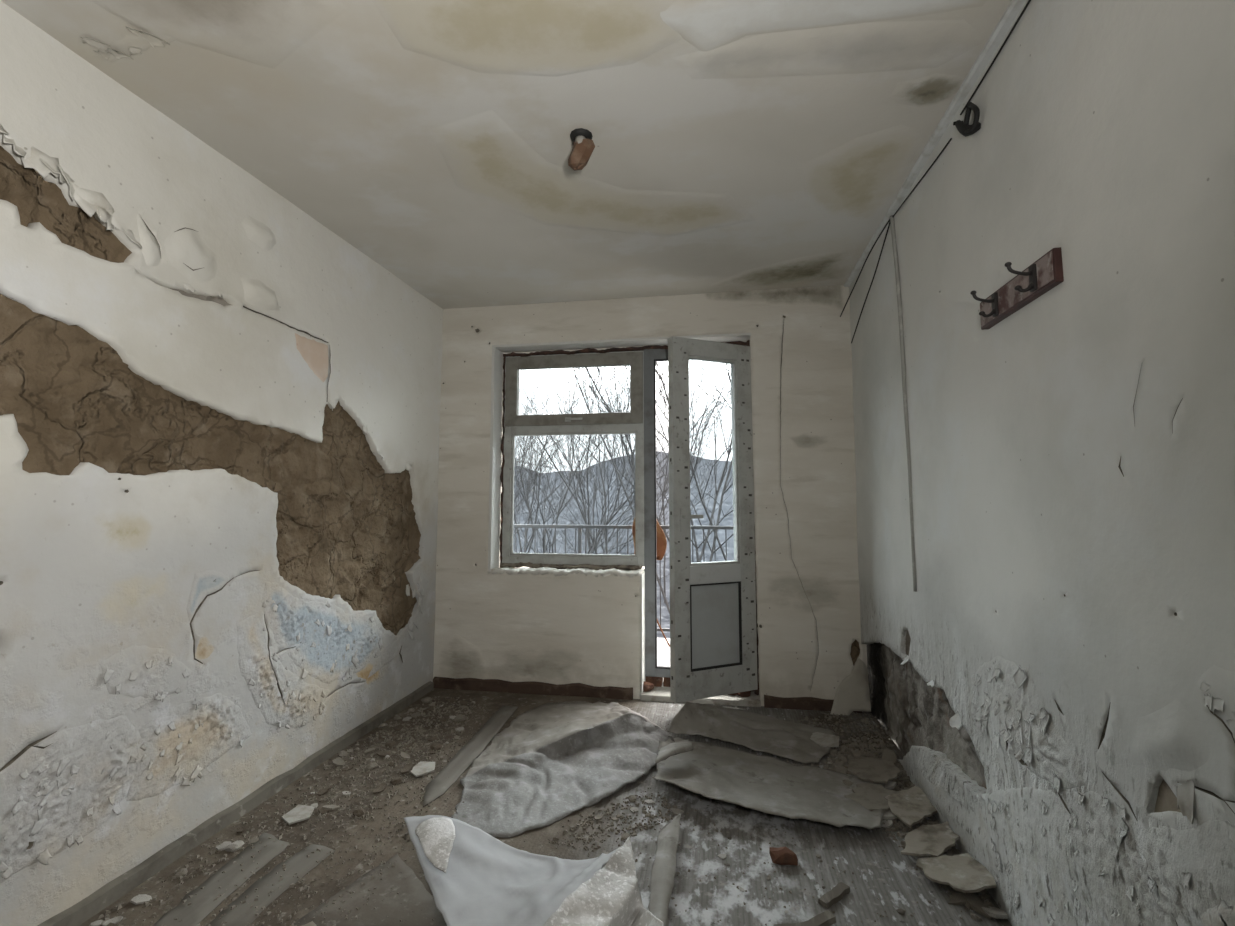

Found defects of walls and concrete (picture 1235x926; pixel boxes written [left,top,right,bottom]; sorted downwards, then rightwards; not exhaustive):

leakage [90,0,349,69]
spalling [0,124,142,263]
leakage [429,110,756,237]
leakage [802,124,925,225]
spalling [158,282,231,306]
spalling [0,294,421,884]
peeling [850,631,1235,926]